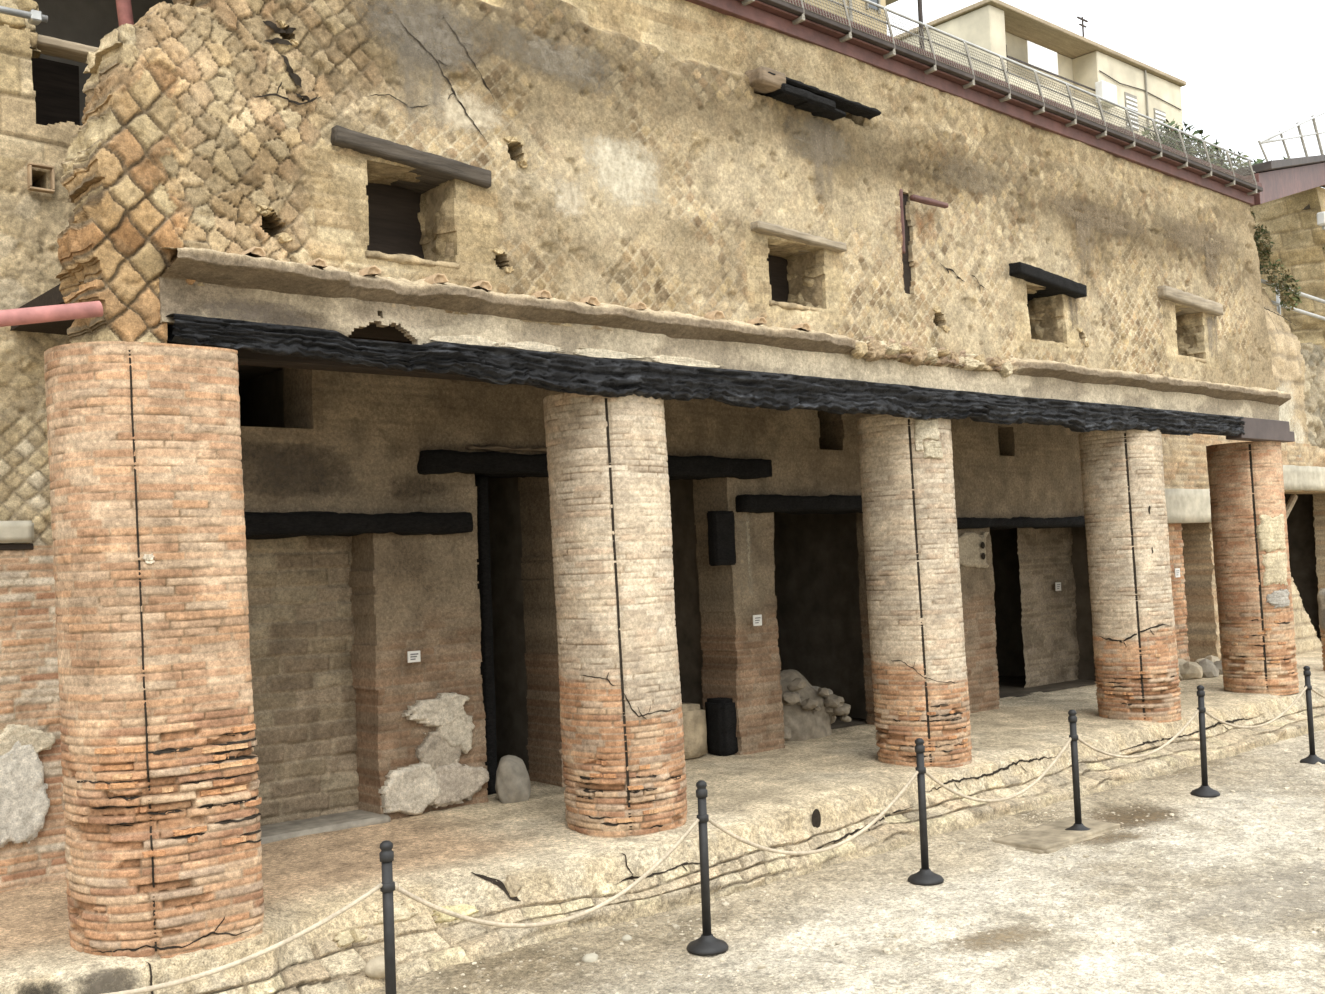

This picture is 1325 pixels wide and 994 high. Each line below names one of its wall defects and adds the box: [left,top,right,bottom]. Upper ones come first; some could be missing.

spalling [263,21,311,102]
crack [371,15,495,144]
crack [1099,624,1169,646]
crack [582,673,677,719]
peeling [0,724,55,848]
spalling [77,724,262,858]
crack [816,756,1056,850]